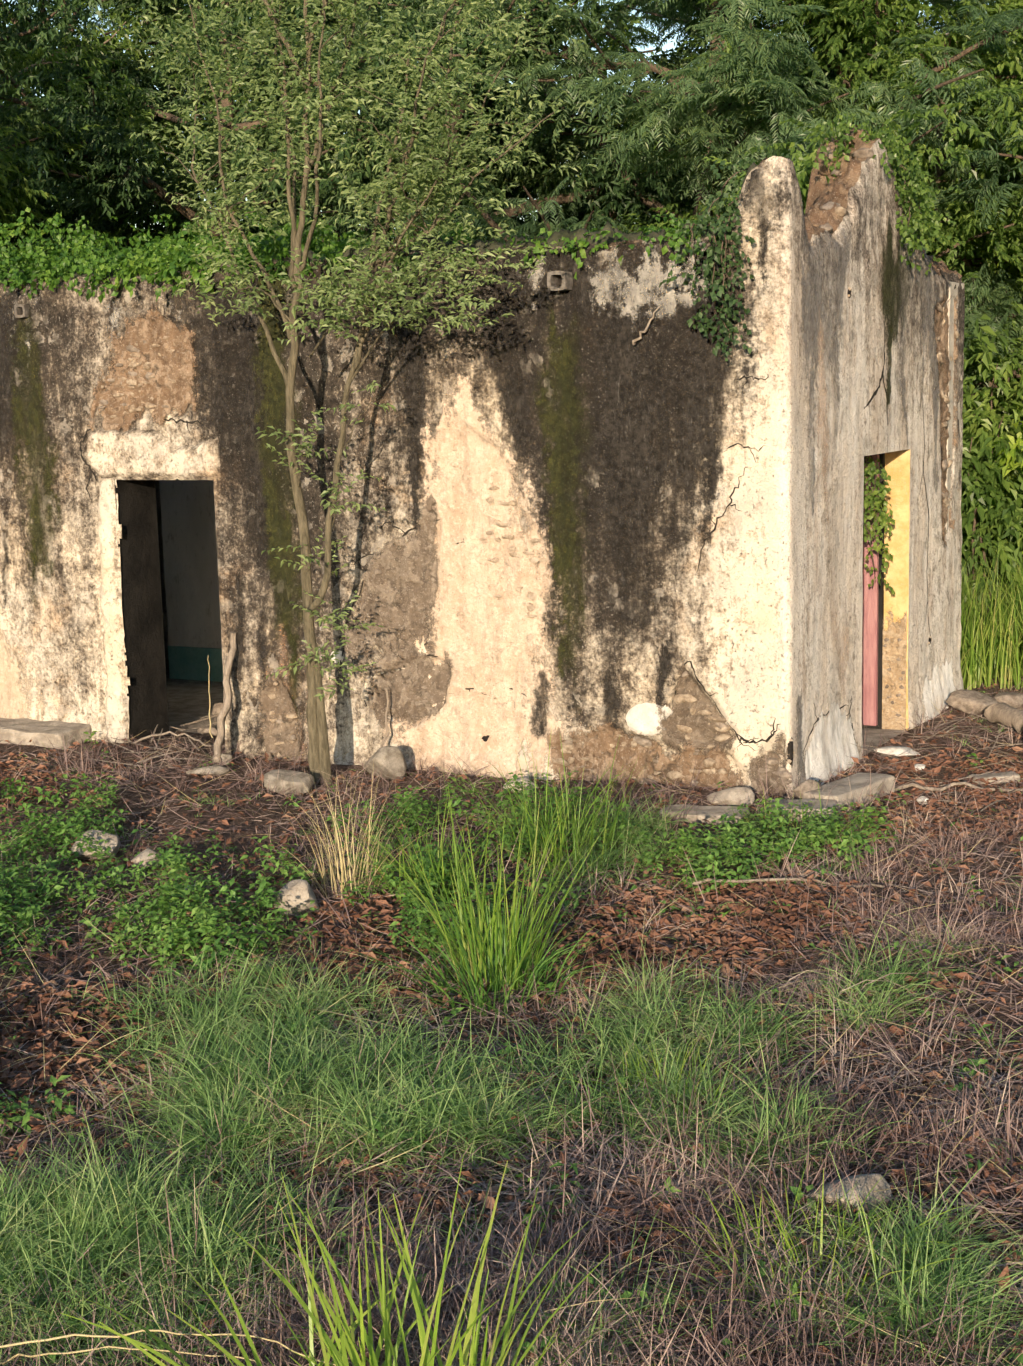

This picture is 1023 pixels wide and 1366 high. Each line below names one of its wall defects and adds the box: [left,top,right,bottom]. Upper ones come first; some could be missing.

damp [0,288,30,464]
spalling [87,304,199,432]
damp [178,265,277,682]
damp [385,293,432,530]
peeling [331,374,796,797]
damp [479,168,791,706]
crack [697,443,764,571]
damp [801,226,850,434]
damp [288,635,300,713]
damp [529,671,550,738]
damp [602,670,621,729]